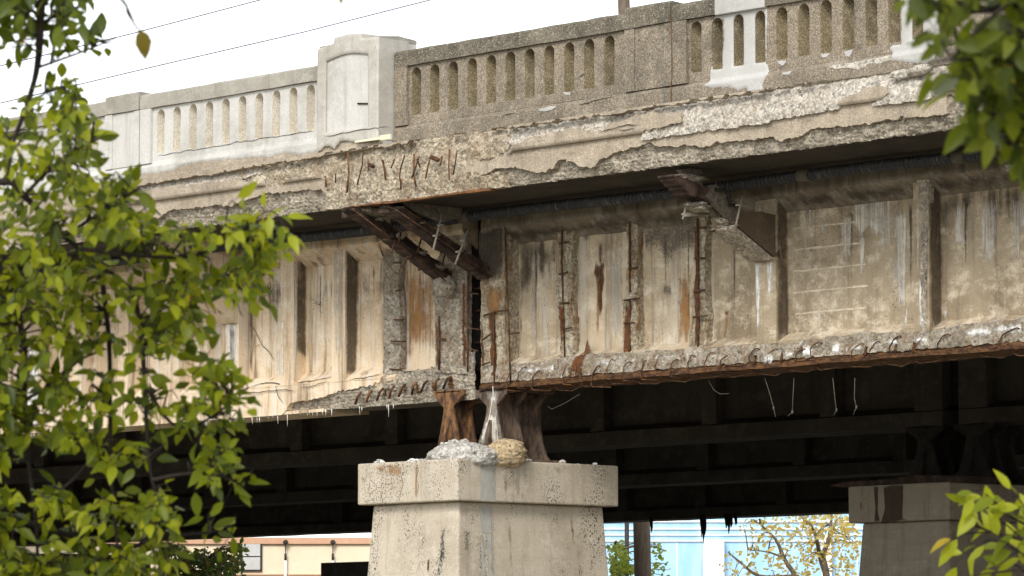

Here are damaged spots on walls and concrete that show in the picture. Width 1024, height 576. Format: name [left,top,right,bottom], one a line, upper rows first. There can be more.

spalling [126,50,965,233]
rust [568,340,591,379]
rust [594,263,604,328]
rust [624,305,632,352]
spalling [292,180,1024,411]
leakage [756,174,1024,338]